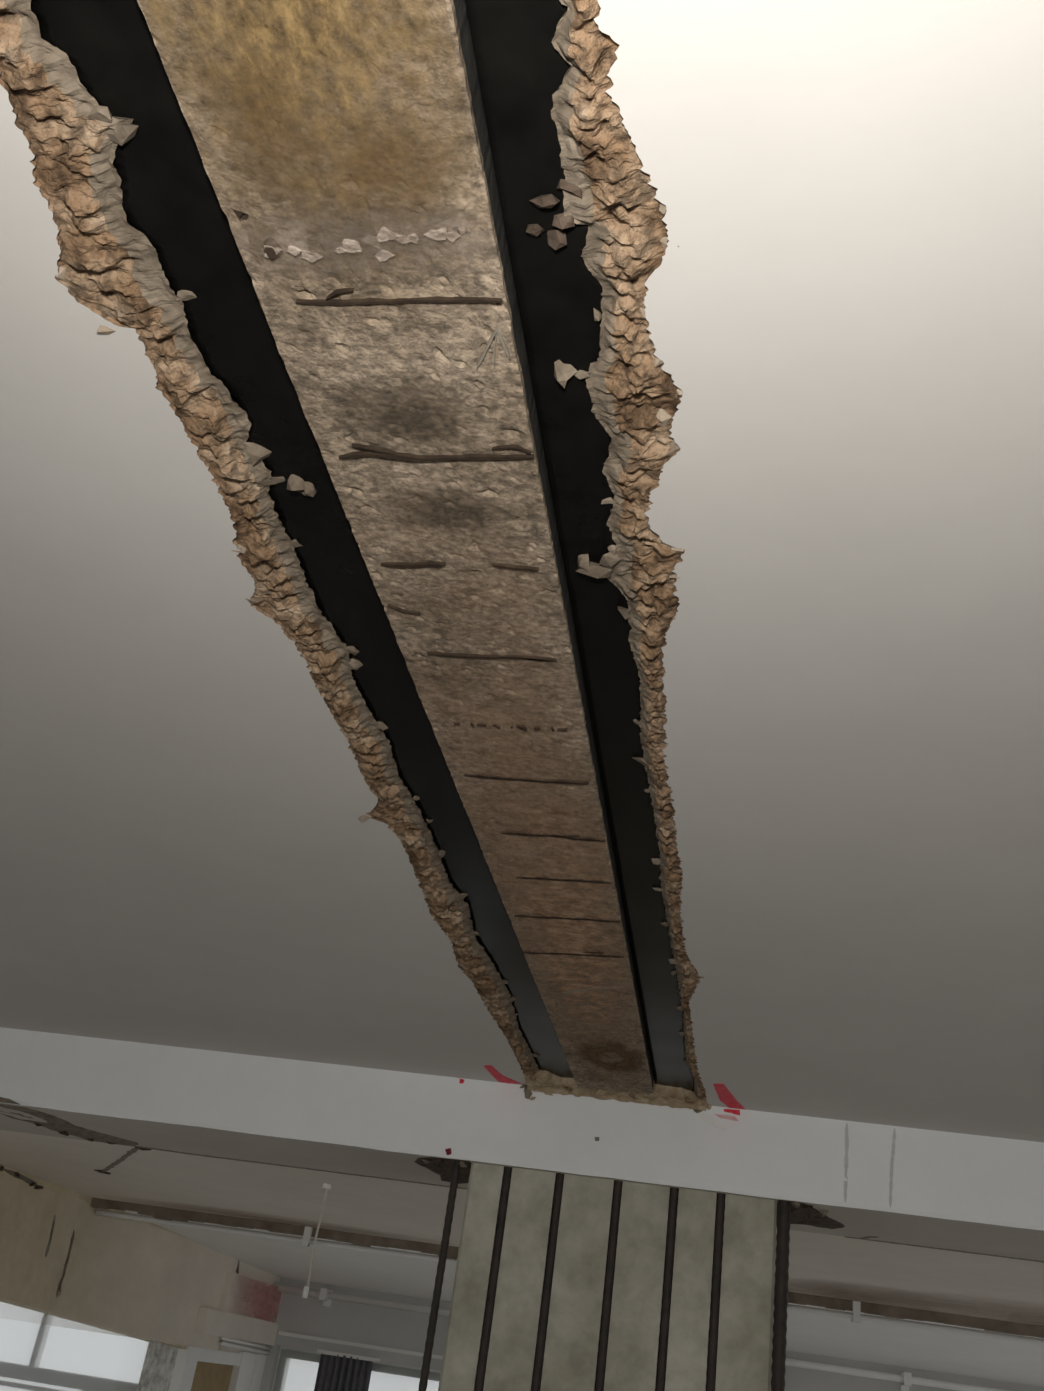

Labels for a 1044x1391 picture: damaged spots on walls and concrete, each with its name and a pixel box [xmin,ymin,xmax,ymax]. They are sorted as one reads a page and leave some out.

crack [295,288,502,305]
crack [339,443,534,461]
spalling [0,0,712,1113]
crack [380,560,446,568]
crack [492,563,539,571]
crack [387,604,420,615]
crack [427,652,557,662]
crack [454,721,567,732]
crack [464,773,589,785]
crack [501,831,605,842]
crack [516,876,611,884]
crack [515,914,624,958]